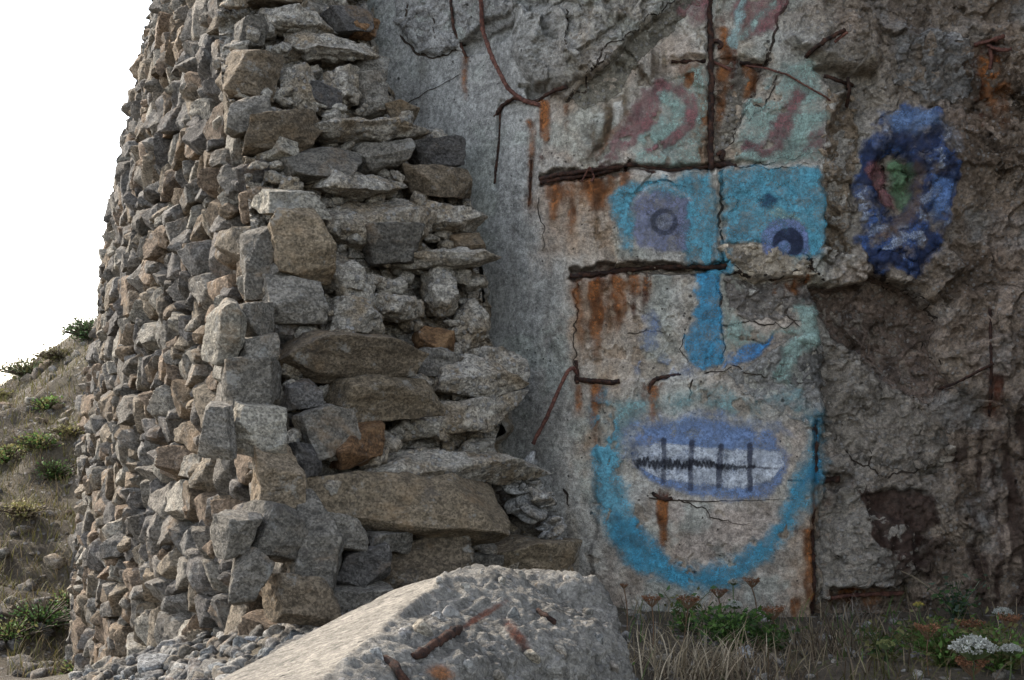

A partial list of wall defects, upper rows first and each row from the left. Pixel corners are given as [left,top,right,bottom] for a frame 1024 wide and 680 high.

spalling [392,0,517,56]
spalling [570,0,700,110]
rust [479,0,854,217]
crack [571,283,579,365]
rust [531,360,620,445]
rust [570,264,727,356]
spalling [717,242,956,476]
rust [651,492,673,548]
crack [650,497,776,525]
rust [790,499,817,616]
spalling [814,482,918,604]
damp [857,488,943,578]